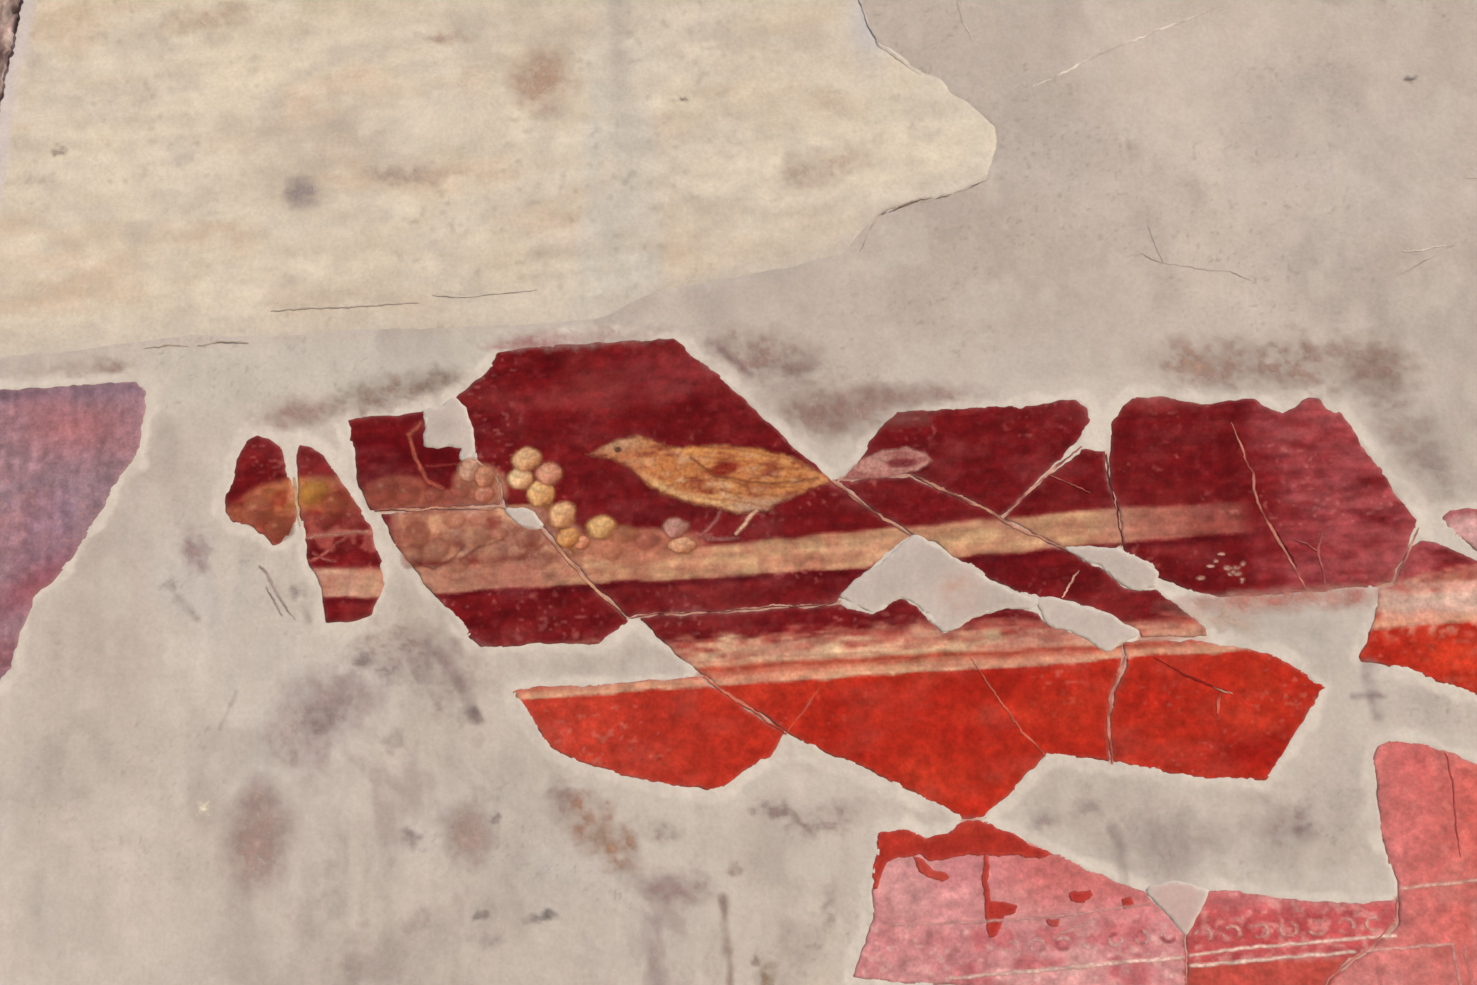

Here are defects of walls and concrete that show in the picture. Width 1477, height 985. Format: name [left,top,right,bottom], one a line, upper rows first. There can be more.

crack [1033,7,1216,87]
flaking render [423,397,475,461]
flaking render [505,507,543,530]
crack [833,481,911,536]
crack [911,446,1123,598]
crack [1231,422,1326,592]
crack [540,529,841,618]
flaking render [840,535,1139,652]
flaking render [1065,546,1159,591]
crack [703,675,819,734]
crack [971,659,1046,757]
crack [1107,655,1233,764]